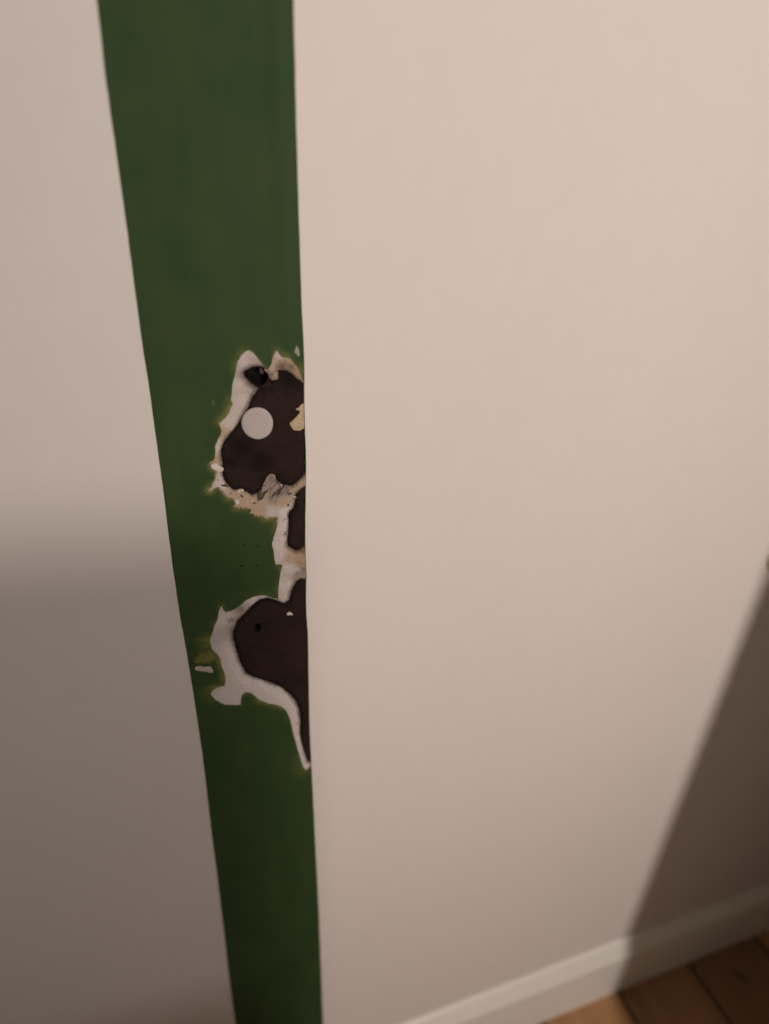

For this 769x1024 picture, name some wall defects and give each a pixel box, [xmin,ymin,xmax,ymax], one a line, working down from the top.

peeling [290,403,304,431]
peeling [196,651,222,685]